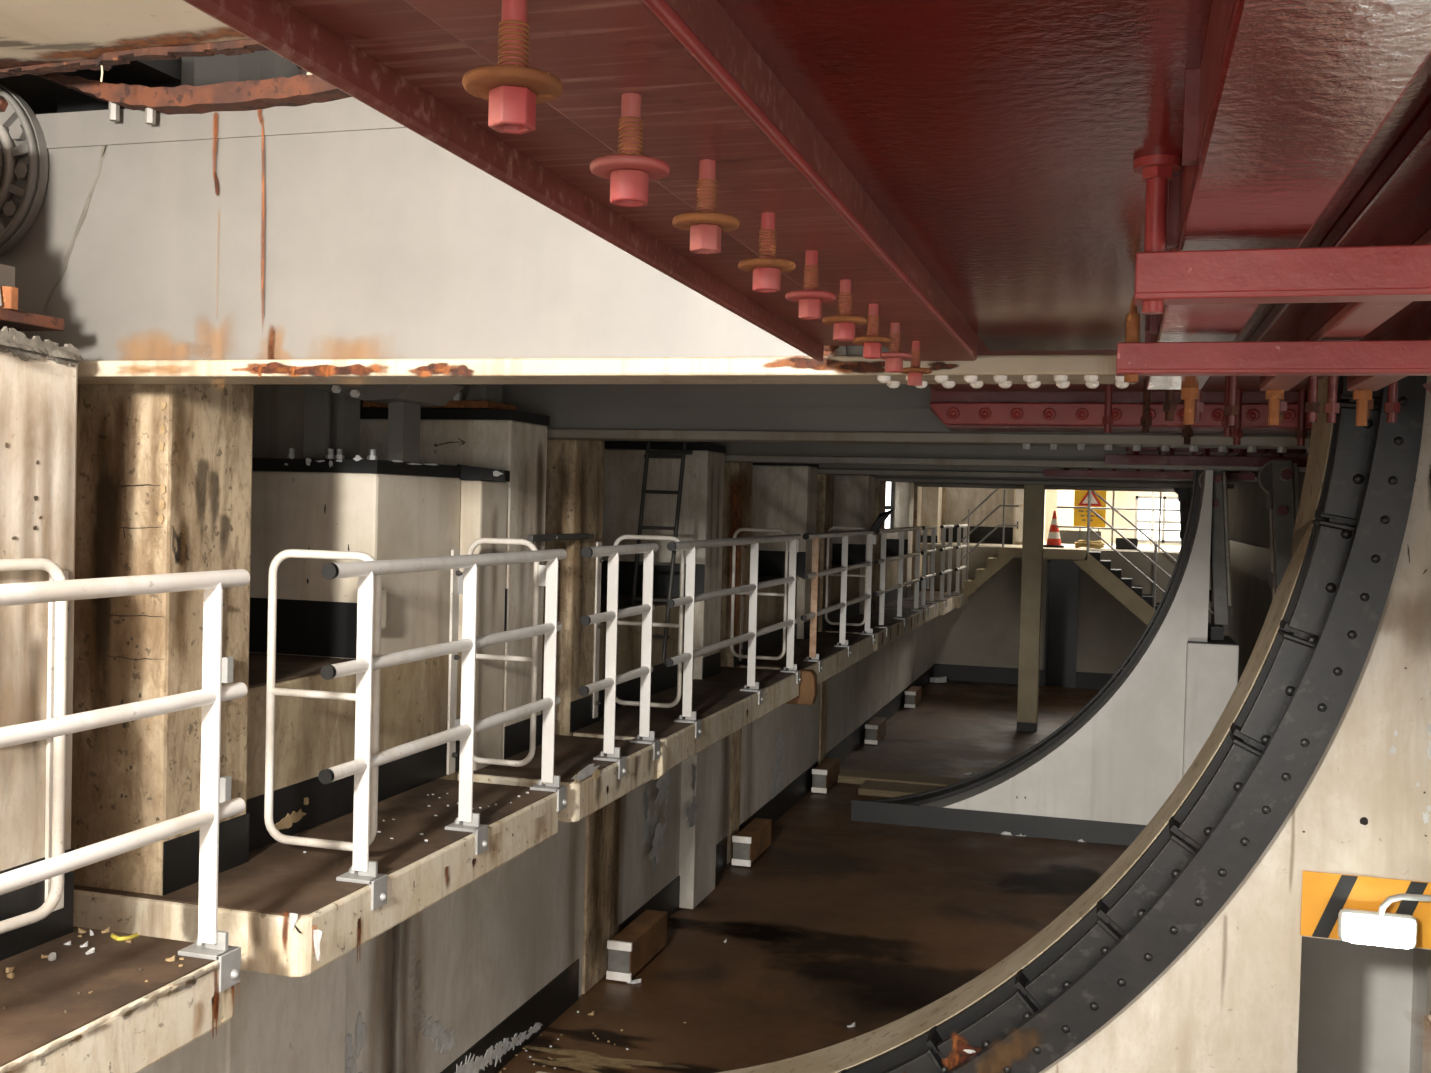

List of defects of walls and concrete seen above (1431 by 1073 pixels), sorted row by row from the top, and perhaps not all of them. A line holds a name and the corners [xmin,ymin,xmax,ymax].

corrosion [0,28,269,82]
corrosion [233,109,387,378]
corrosion [409,363,474,377]
corrosion [764,350,885,374]
corrosion [943,1032,1036,1073]